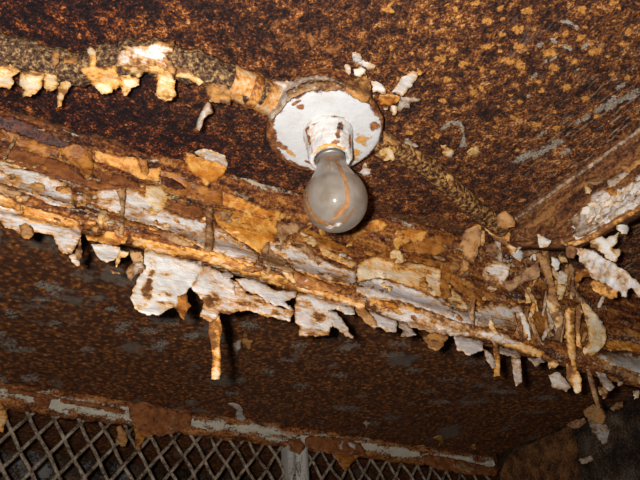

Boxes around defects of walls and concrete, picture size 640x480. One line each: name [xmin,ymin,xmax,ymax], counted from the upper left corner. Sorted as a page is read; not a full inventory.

rust [481,5,505,26]
rust [499,23,529,54]
rust [561,26,588,48]
peeling [0,40,231,108]
peeling [266,52,425,120]
rust [424,44,471,83]
rust [479,43,526,70]
rust [541,48,559,71]
peeling [0,114,640,394]
peeling [0,400,8,433]
peeling [7,387,192,450]
peeling [228,403,246,422]